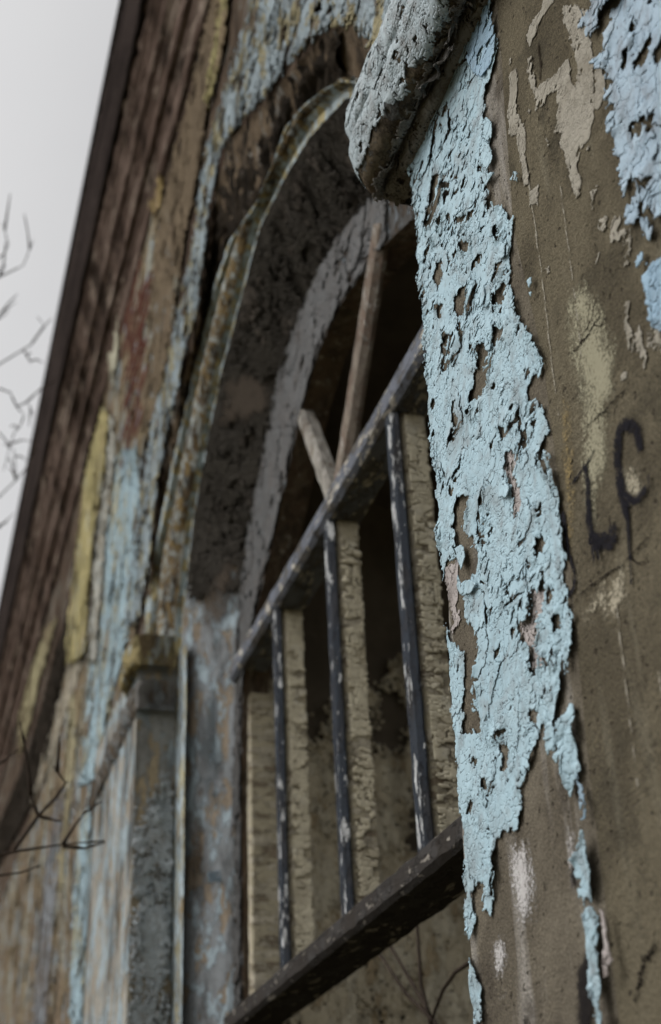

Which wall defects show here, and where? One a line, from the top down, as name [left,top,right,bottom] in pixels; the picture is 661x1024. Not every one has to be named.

peeling [118,0,574,1024]